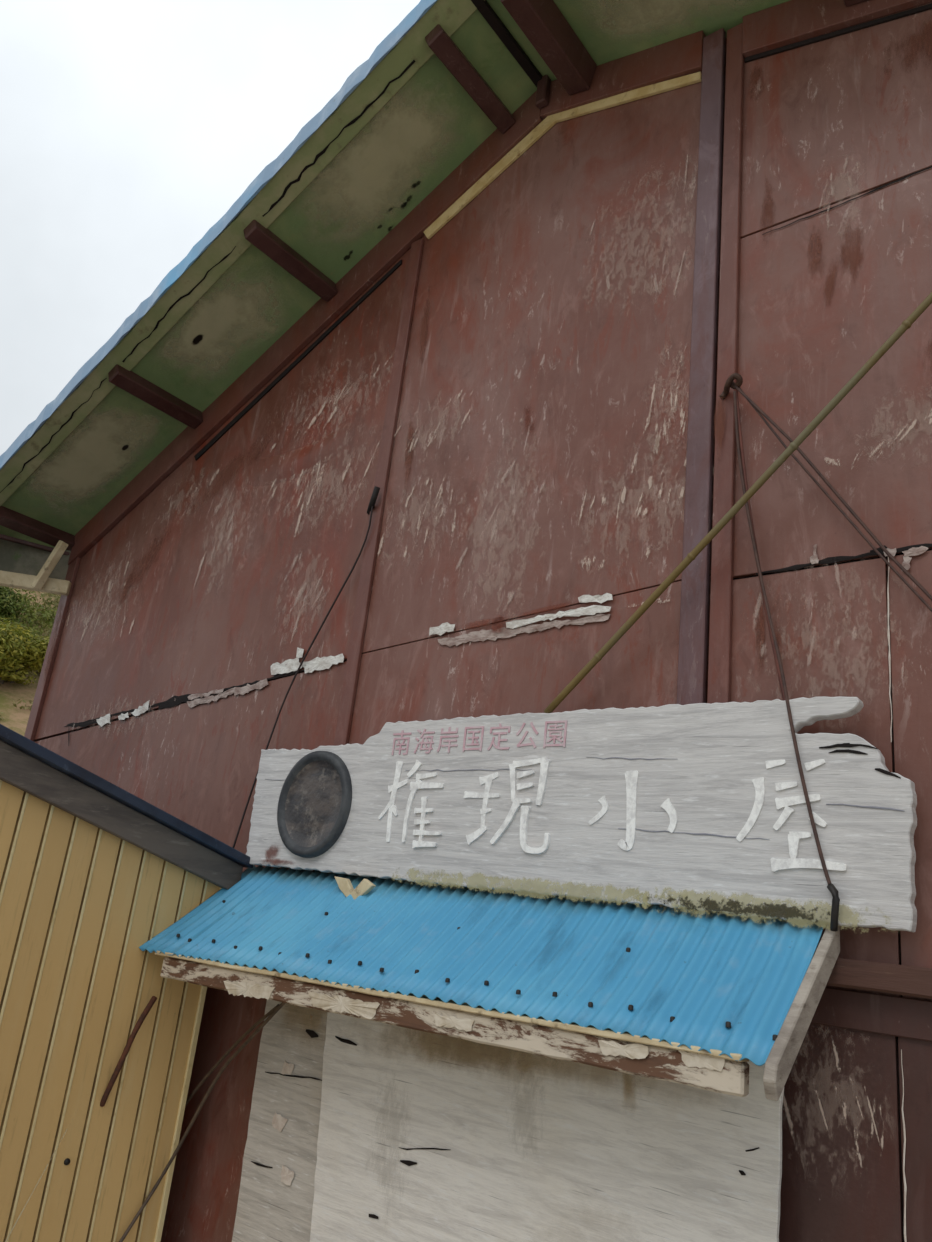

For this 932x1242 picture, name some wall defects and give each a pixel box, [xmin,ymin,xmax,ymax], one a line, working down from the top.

peeling [429,593,613,647]
peeling [187,647,344,708]
peeling [96,700,150,727]
peeling [224,980,275,1000]
peeling [308,991,380,1019]
peeling [434,1013,475,1032]
peeling [598,1040,649,1059]
peeling [678,1050,725,1072]